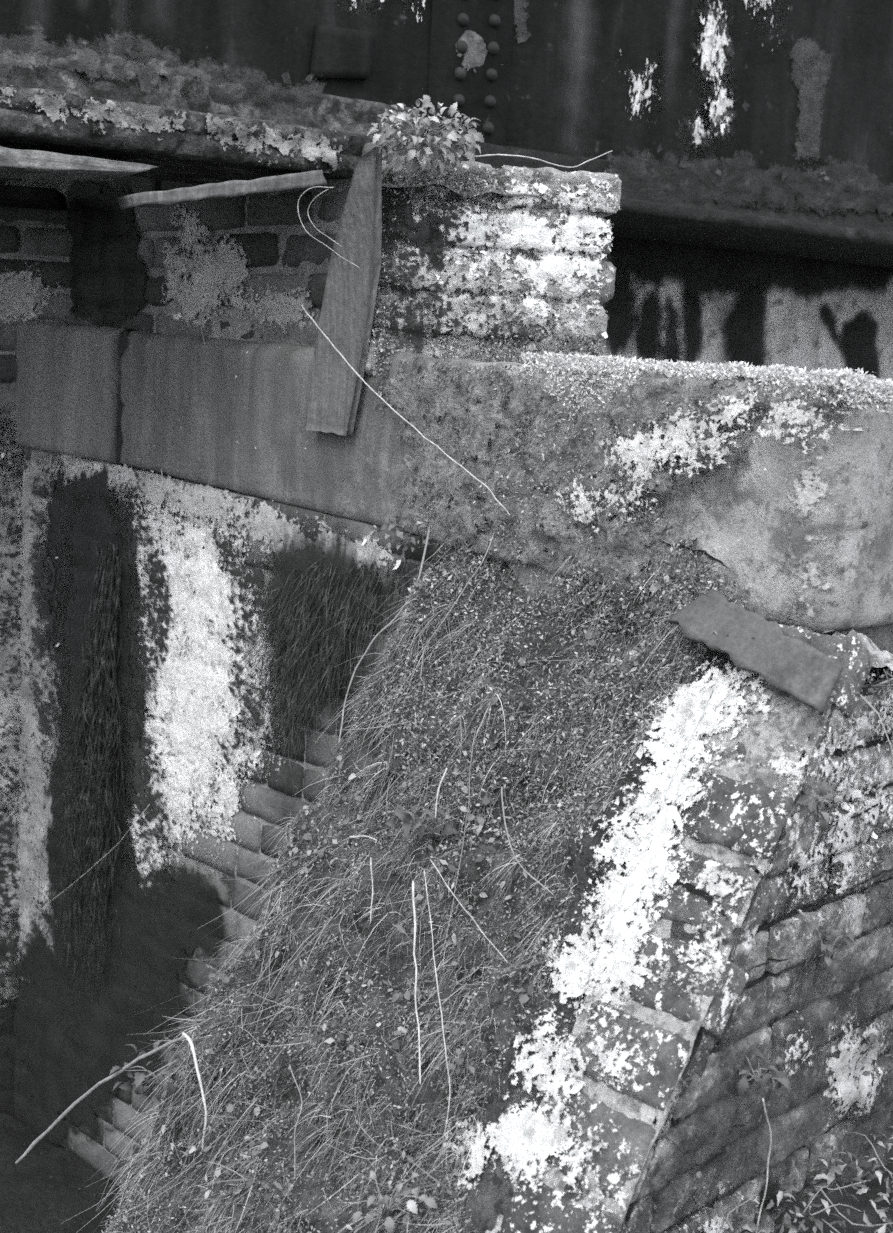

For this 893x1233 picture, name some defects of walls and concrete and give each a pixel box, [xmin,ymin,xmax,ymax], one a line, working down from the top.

rust [513,0,532,43]
peeling [619,58,660,128]
peeling [678,0,737,168]
rust [790,37,831,163]